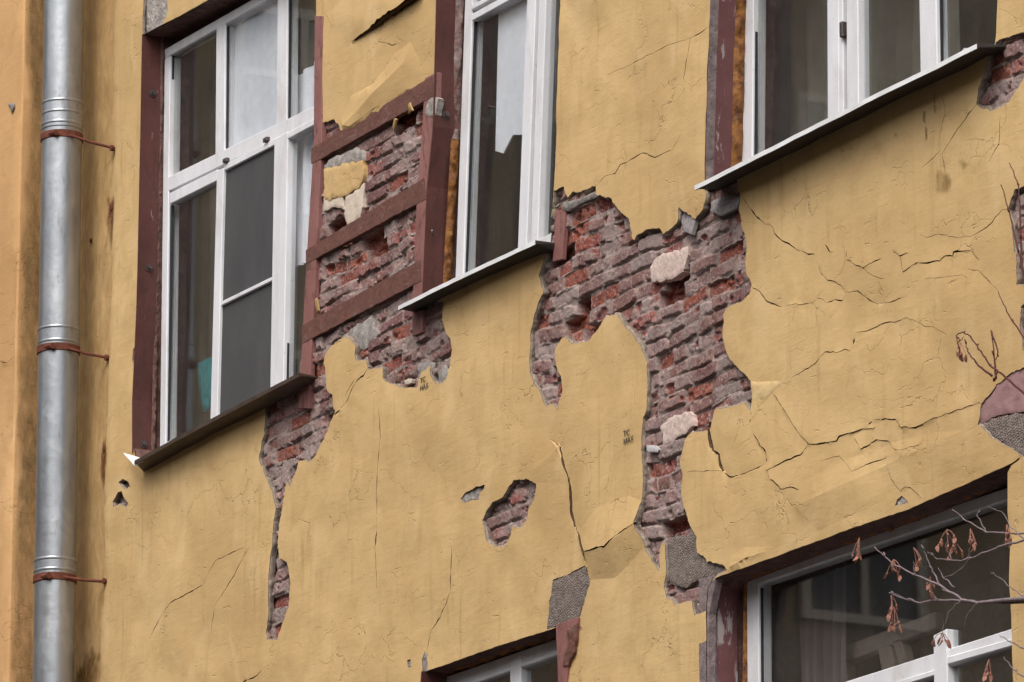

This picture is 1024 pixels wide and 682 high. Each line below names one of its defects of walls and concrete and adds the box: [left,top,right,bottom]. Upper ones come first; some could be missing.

crack [610,29,705,78]
flaking render [976,32,1024,111]
flaking render [320,97,444,241]
crack [596,138,679,186]
crack [743,198,1006,375]
flaking render [259,289,452,641]
flaking render [482,478,536,548]
crack [550,439,638,565]
flaking render [529,182,783,616]
crack [690,397,976,493]
flaking render [978,367,1024,461]
flaking render [546,565,590,633]